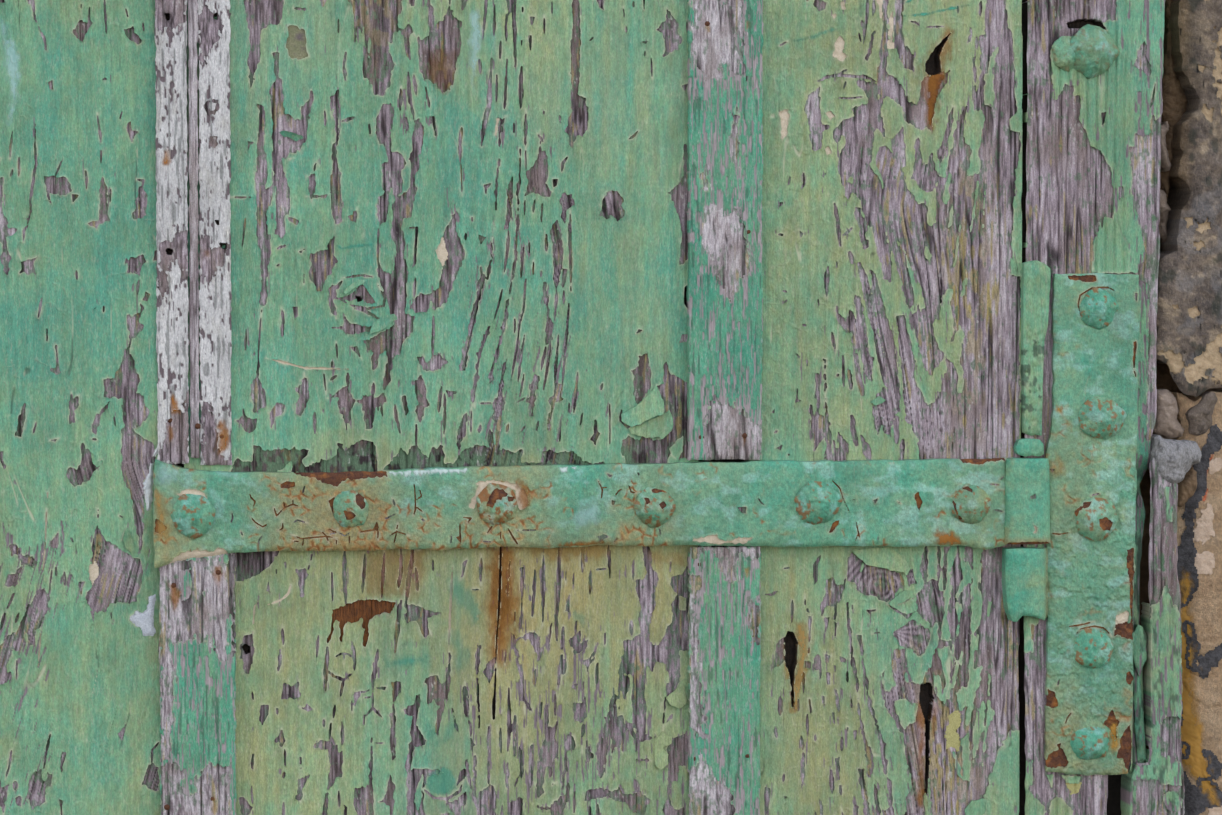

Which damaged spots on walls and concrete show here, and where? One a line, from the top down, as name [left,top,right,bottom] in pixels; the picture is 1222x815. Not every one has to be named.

peeling [0,175,42,279]
peeling [62,0,787,815]
peeling [776,0,1222,815]
corrosion [280,471,391,526]
peeling [0,540,53,688]
corrosion [327,599,395,647]
crack [230,484,634,815]
corrosion [489,548,515,657]
corrosion [1111,546,1135,642]
peeling [0,752,66,815]
crack [774,664,853,815]
corrosion [1101,707,1132,770]